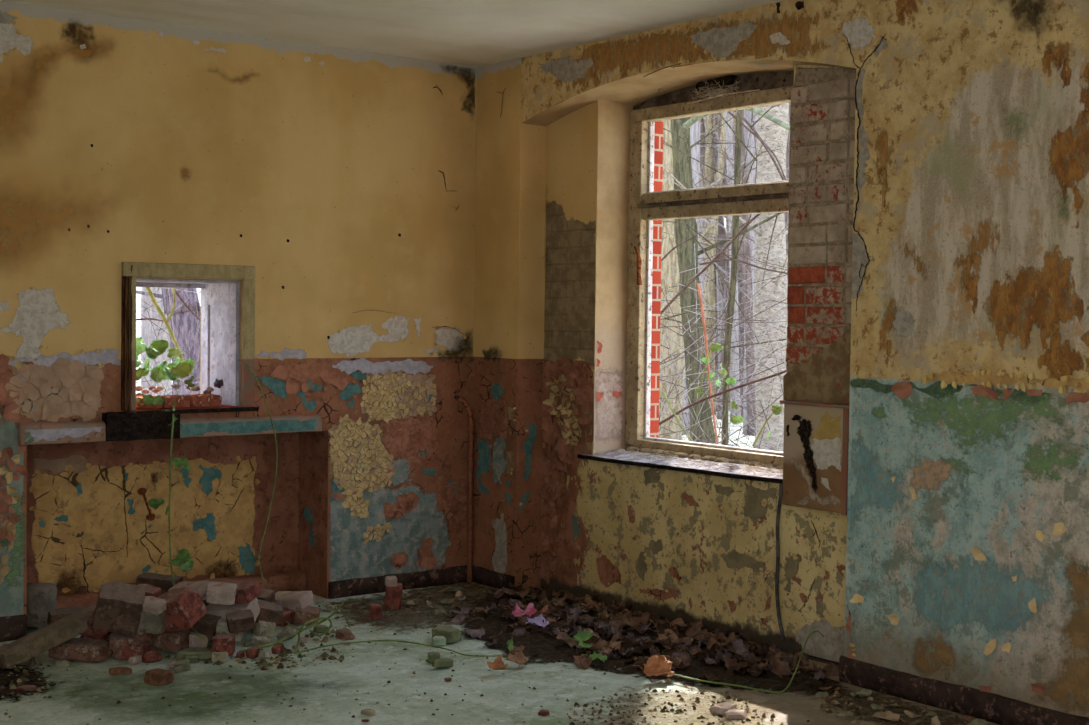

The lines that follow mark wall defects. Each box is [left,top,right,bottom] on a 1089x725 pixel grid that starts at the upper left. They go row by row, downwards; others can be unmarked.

leakage [63,22,105,59]
peeling [686,21,758,58]
crack [843,34,886,311]
flaking render [783,18,888,490]
peeling [475,201,623,588]
peeling [890,368,1089,403]
crack [79,491,128,593]
peeling [0,286,467,617]
peeling [636,539,682,601]
peeling [714,482,777,524]
spalling [760,554,864,662]
leakage [1038,557,1089,711]